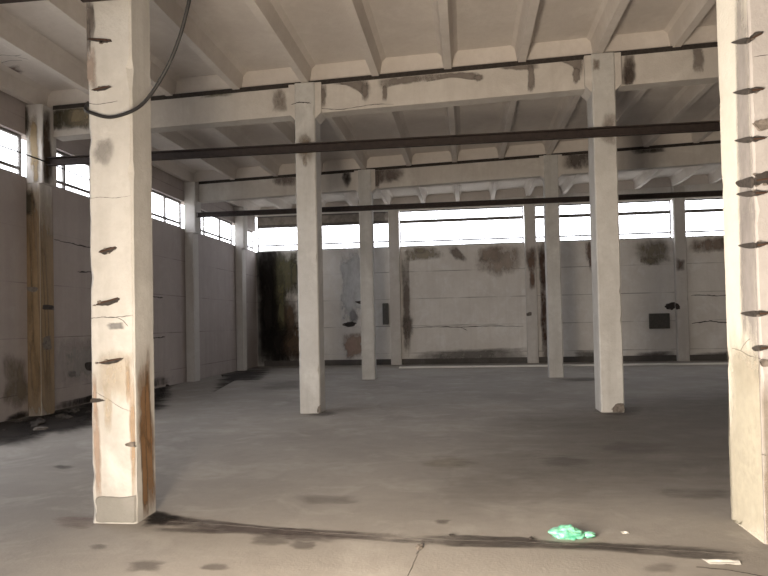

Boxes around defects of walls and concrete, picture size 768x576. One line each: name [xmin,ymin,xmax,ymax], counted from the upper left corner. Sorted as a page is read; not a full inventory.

water stain [407,248,437,260]
water stain [482,247,516,273]
spalling [93,297,120,306]
water stain [216,252,299,388]
water stain [403,274,412,346]
spalling [84,358,123,371]
rust [130,365,155,509]